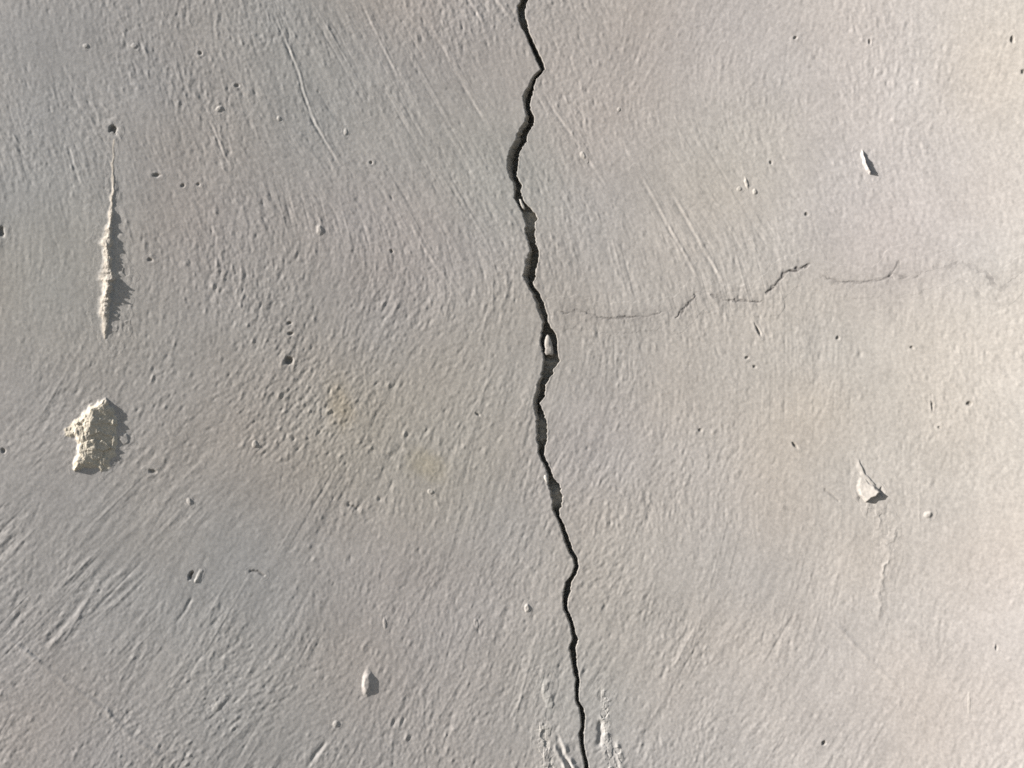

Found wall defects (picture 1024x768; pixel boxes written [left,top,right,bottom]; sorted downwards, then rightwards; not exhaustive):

crack [505,0,1024,768]